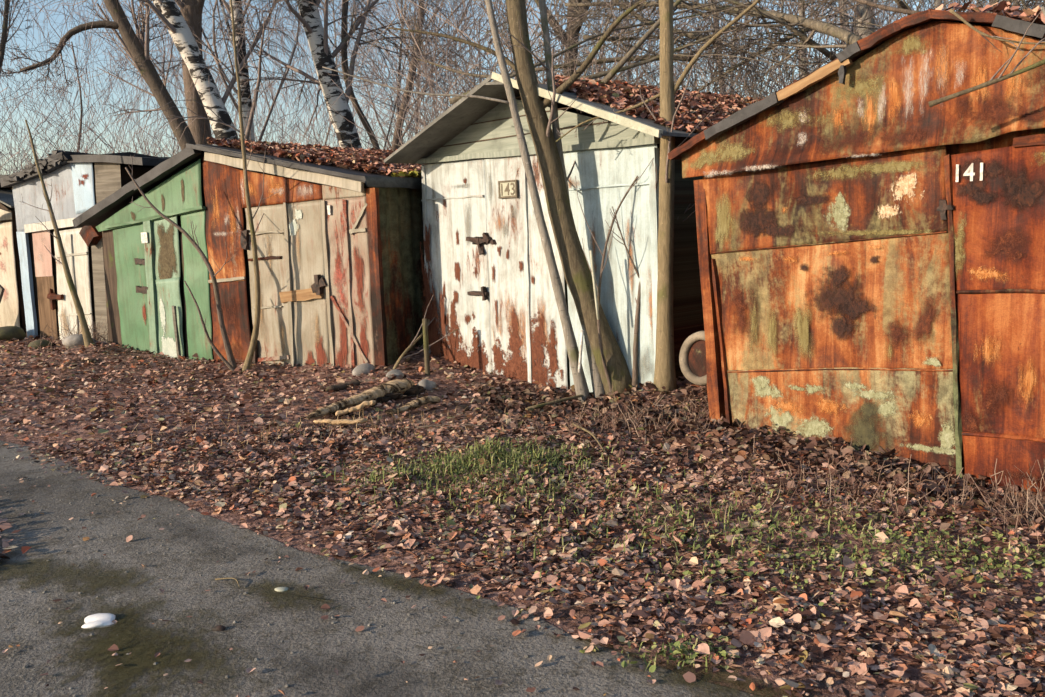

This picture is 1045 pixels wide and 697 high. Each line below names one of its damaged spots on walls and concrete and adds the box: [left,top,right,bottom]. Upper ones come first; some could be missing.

rust [818,79,925,151]
rust [956,65,1045,127]
peeling [159,299,182,358]
peeling [334,244,369,368]
peeling [419,218,566,388]
rust [733,291,758,346]
rust [805,251,875,340]
rust [887,297,936,345]
rust [970,268,1006,279]
rust [984,339,1000,361]
rust [818,399,844,414]
rust [1020,366,1036,400]